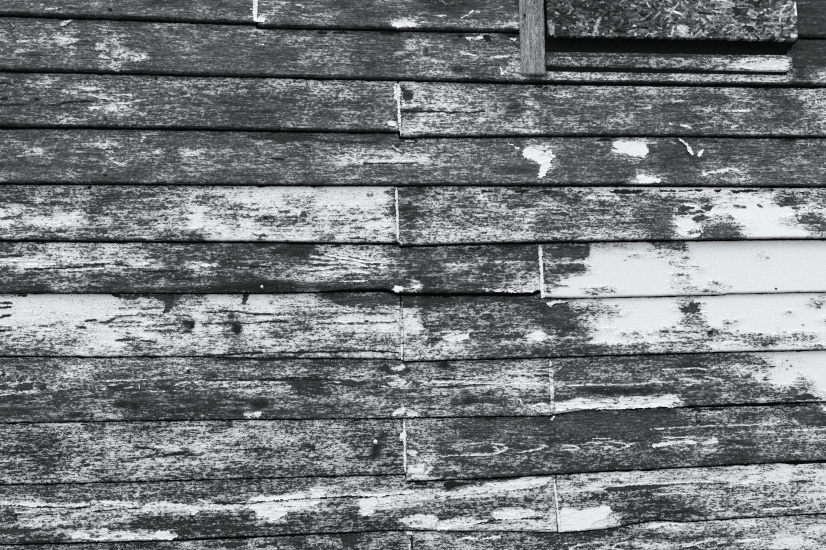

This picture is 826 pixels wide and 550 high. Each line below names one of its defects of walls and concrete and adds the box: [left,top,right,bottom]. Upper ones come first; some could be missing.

peeling [596,138,649,158]
peeling [508,143,556,178]
spalling [610,174,703,194]
peeling [646,204,740,239]
peeling [769,189,826,232]
peeling [542,244,591,270]
peeling [0,294,27,318]
peeling [112,294,174,313]
peeling [679,302,701,314]
peeling [0,437,552,545]
peeling [216,541,280,549]